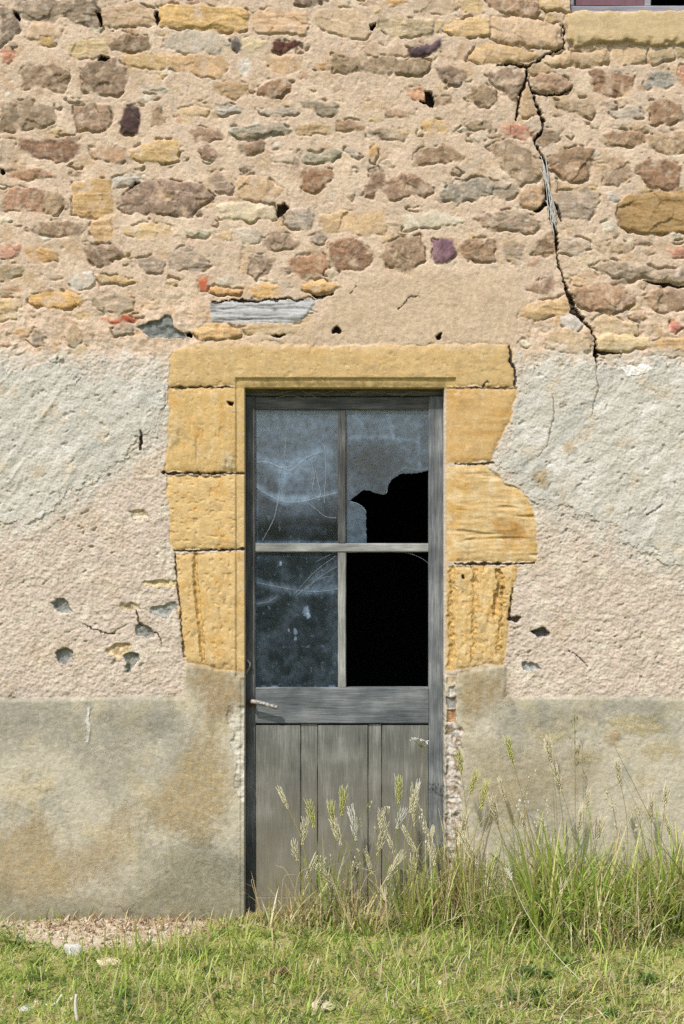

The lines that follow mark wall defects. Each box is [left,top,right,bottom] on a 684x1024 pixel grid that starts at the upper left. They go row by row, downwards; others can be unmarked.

crack [498,25,622,363]
crack [508,346,517,387]
spalling [141,579,177,589]
spalling [51,598,73,613]
spalling [120,601,177,618]
spalling [469,565,521,662]
spalling [531,627,550,638]
spalling [105,622,154,672]
spalling [55,648,73,664]
spalling [522,661,541,672]
spalling [445,565,465,891]